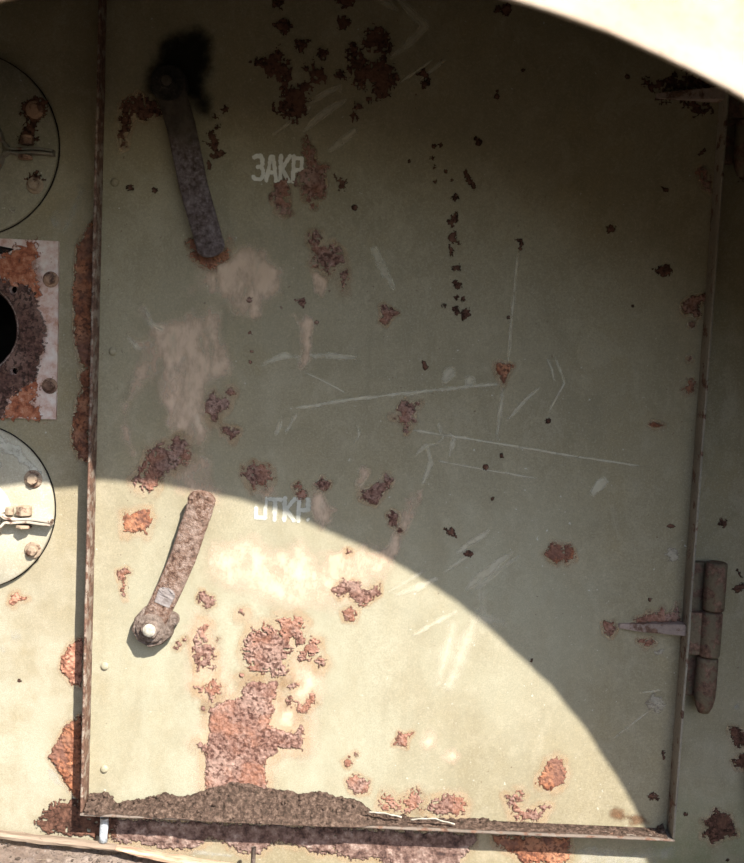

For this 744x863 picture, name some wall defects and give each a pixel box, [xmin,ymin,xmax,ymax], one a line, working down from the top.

corrosion [249,0,400,125]
corrosion [641,69,719,118]
corrosion [0,237,48,423]
corrosion [71,222,93,462]
corrosion [131,436,192,493]
corrosion [331,577,382,622]
corrosion [60,638,83,687]
corrosion [173,615,327,789]
corrosion [34,714,477,863]
corrosion [535,757,567,791]
corrosion [492,835,572,863]
corrosion [702,808,737,844]